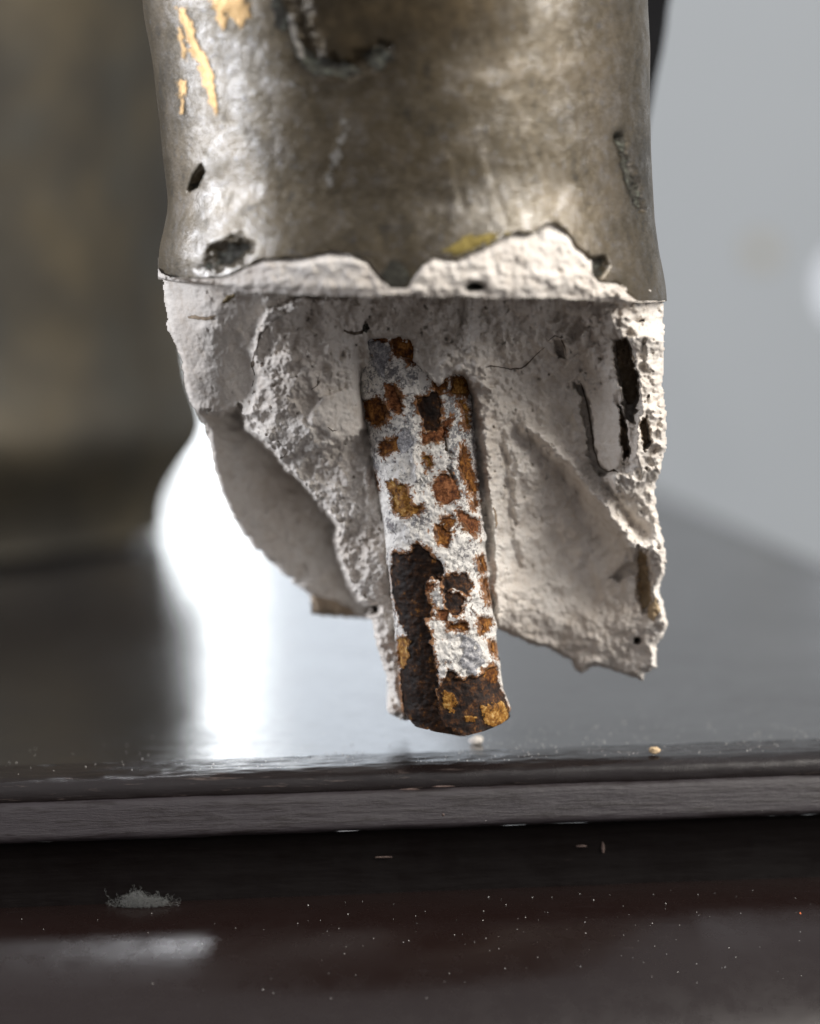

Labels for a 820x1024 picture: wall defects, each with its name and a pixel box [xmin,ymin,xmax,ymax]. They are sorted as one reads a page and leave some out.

spalling [381,260,412,288]
corrosion [372,338,416,364]
corrosion [363,384,404,425]
peeling [417,390,442,432]
spalling [616,338,637,457]
spalling [639,418,650,449]
corrosion [375,471,422,517]
corrosion [422,419,482,548]
spalling [637,550,652,609]
peeling [390,544,510,735]
corrosion [436,609,500,684]
corrosion [442,690,509,727]